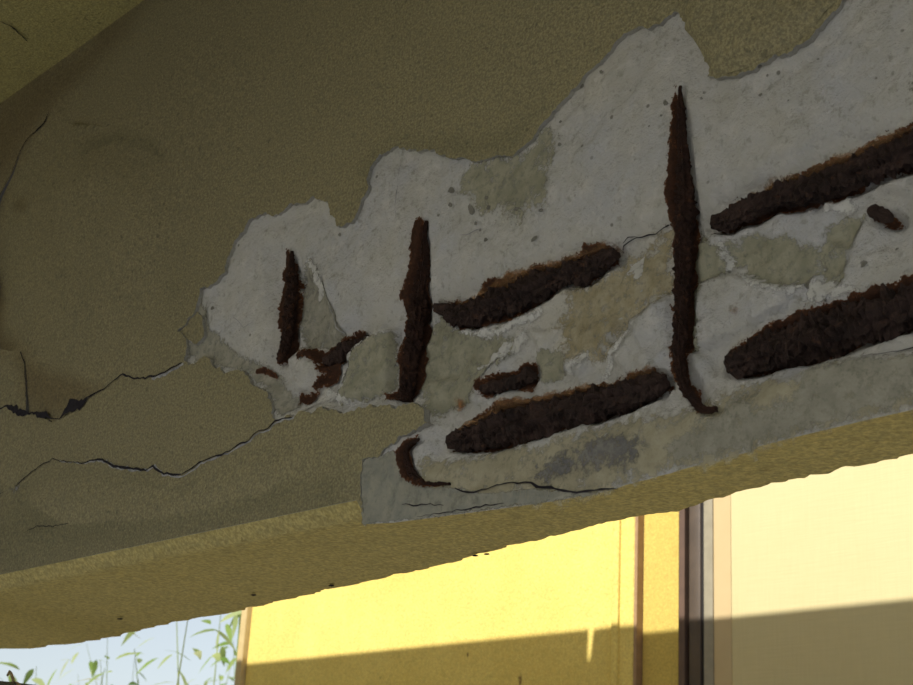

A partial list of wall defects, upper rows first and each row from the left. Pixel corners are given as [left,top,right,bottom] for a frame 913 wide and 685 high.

spalling [188,0,913,490]
corrosion [664,85,678,286]
corrosion [754,122,913,194]
corrosion [878,217,906,230]
corrosion [255,248,366,406]
corrosion [382,216,432,403]
corrosion [448,182,879,430]
corrosion [729,274,913,351]
crack [0,352,183,419]
crack [0,417,294,494]
corrosion [394,434,444,488]
corrosion [444,438,536,453]